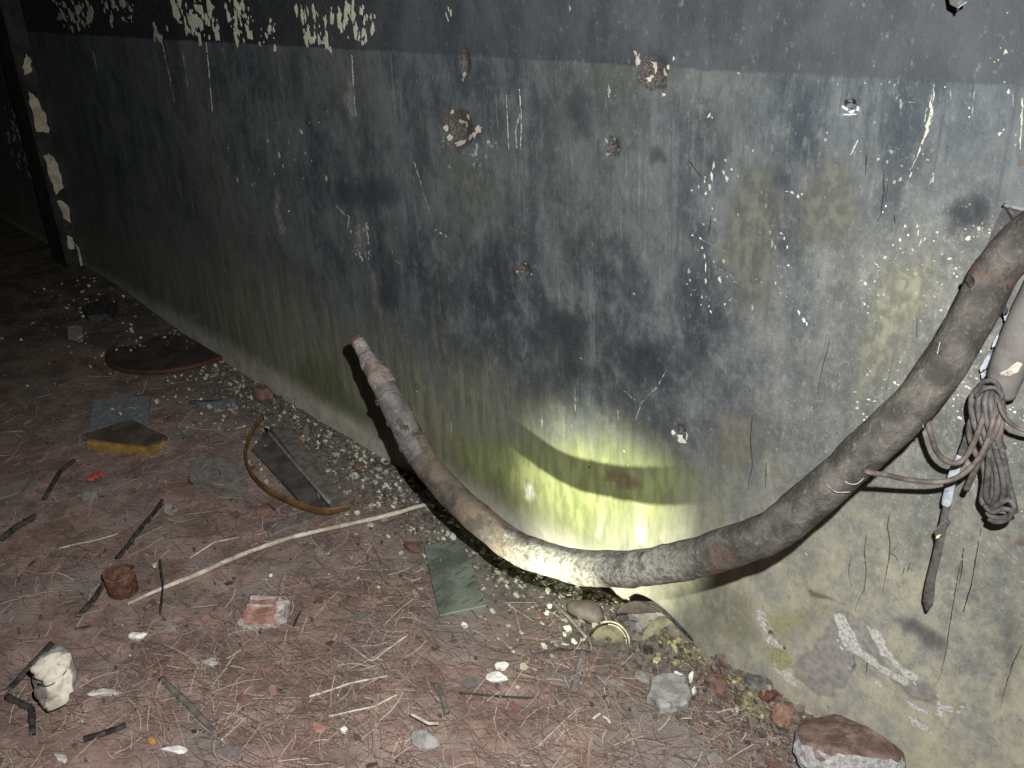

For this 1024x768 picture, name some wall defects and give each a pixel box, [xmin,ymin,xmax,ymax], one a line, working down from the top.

peeling [52,0,133,32]
peeling [153,0,276,52]
peeling [294,0,375,53]
flaking render [22,54,32,75]
spalling [633,51,675,97]
flaking render [29,91,50,133]
spalling [441,107,498,176]
leakage [951,201,988,227]